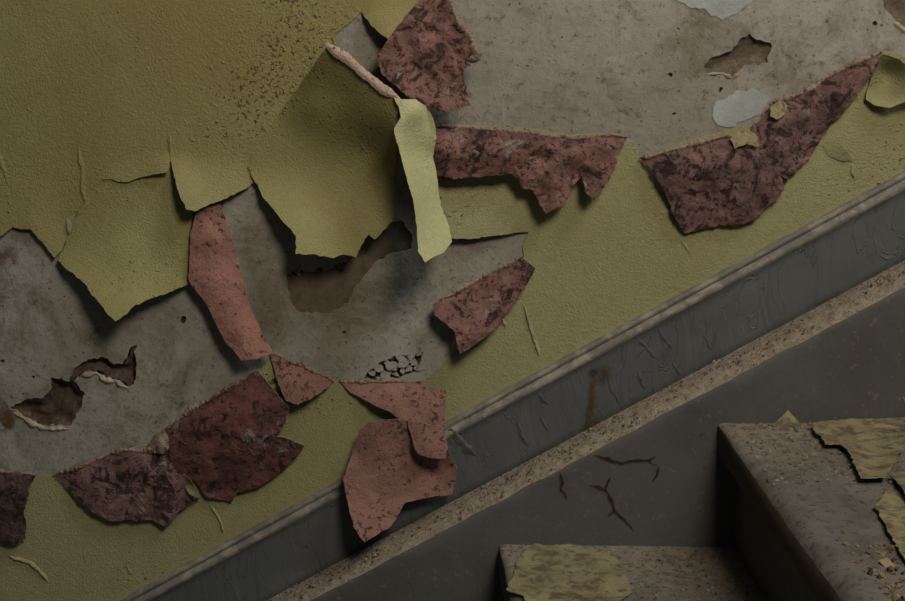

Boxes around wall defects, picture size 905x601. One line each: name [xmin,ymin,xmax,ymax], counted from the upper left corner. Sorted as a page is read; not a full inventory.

peeling [677,0,752,20]
flaking render [882,0,905,33]
peeling [248,0,628,314]
peeling [640,34,905,233]
peeling [432,256,536,354]
flaking render [11,346,137,432]
peeling [52,165,457,542]
peeling [0,469,36,545]
crack [559,473,567,500]
crack [590,455,659,531]